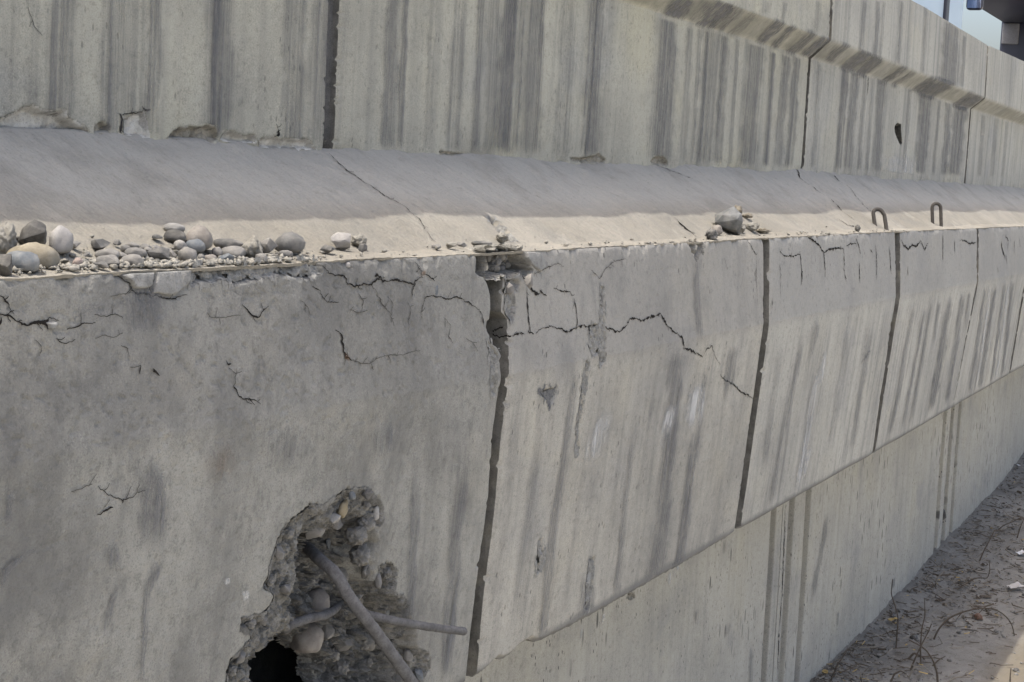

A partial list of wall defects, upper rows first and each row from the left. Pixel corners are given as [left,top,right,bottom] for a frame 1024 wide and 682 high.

leakage [210,0,229,129]
leakage [655,0,737,156]
leakage [742,20,882,168]
spalling [894,123,902,144]
leakage [876,28,983,173]
crack [0,278,186,376]
crack [71,474,145,515]
crack [208,304,266,324]
crack [226,361,261,405]
crack [302,263,752,398]
leakage [660,361,698,530]
spalling [226,486,431,682]